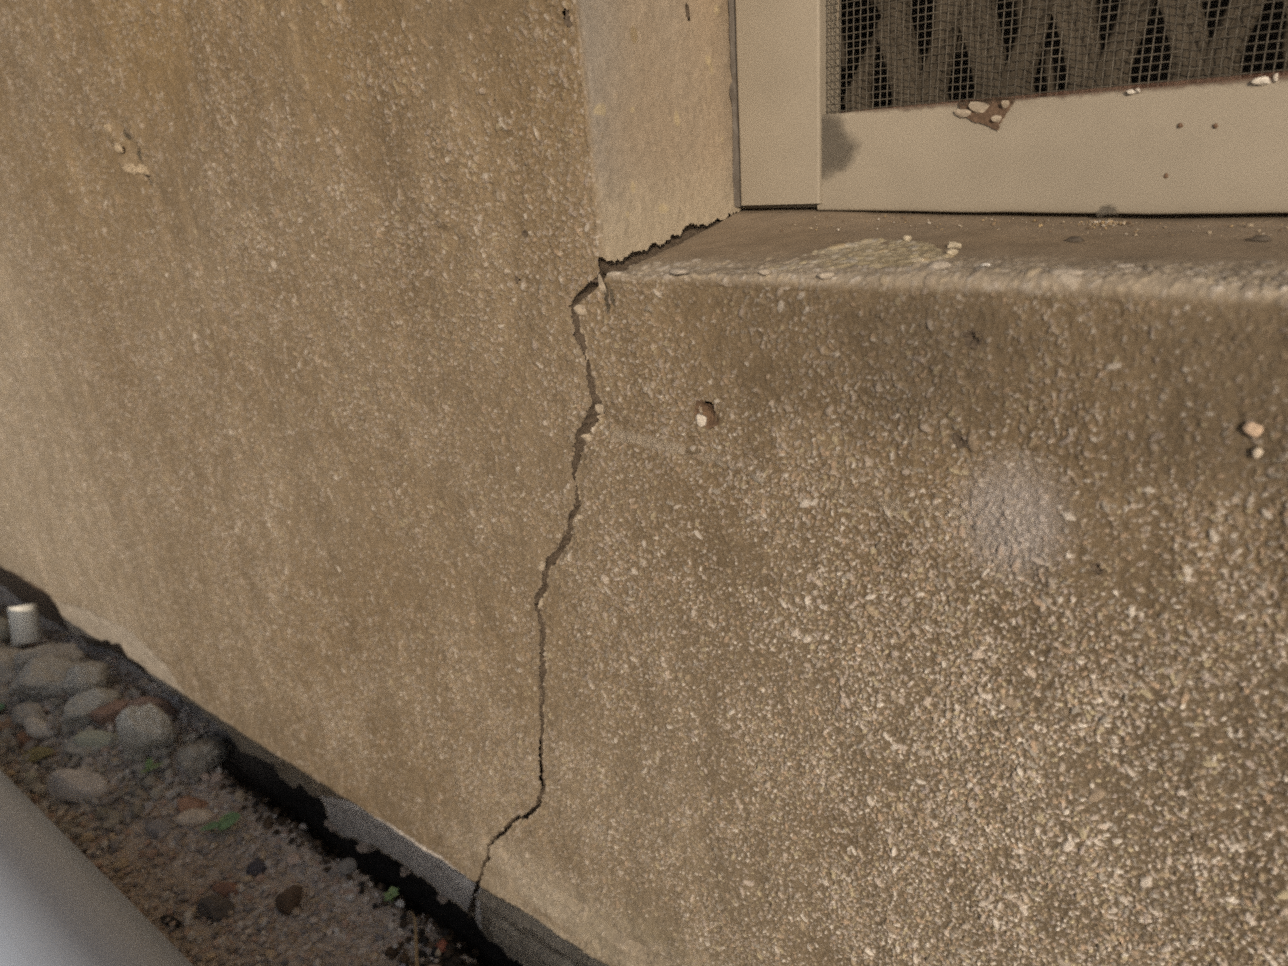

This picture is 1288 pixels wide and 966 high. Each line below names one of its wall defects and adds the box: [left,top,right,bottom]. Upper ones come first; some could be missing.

peeling [954,97,1015,130]
crack [467,217,728,920]